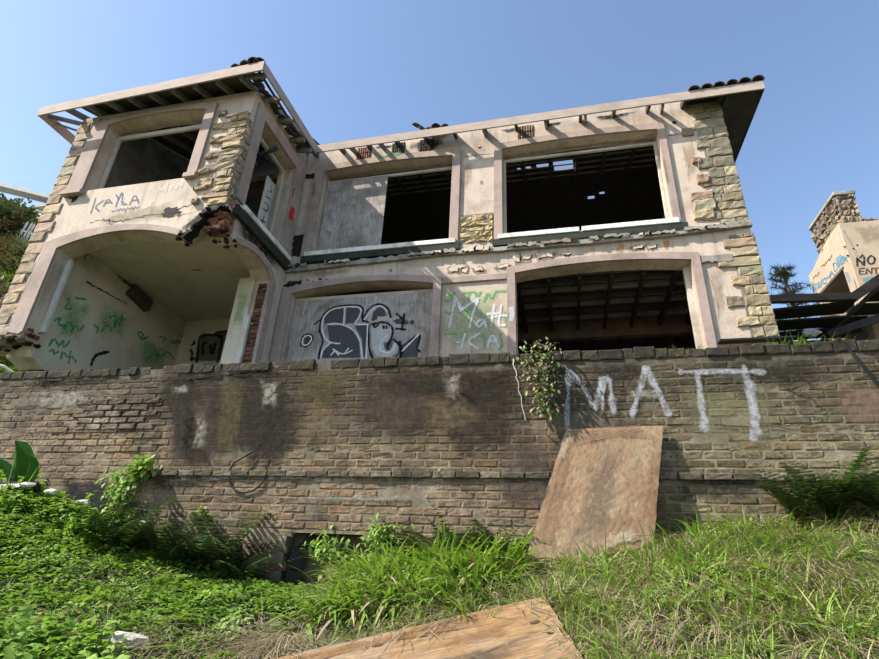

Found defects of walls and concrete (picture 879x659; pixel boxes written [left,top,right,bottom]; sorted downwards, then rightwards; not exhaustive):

crack [90,204,198,225]
spalling [175,203,237,249]
spalling [407,212,494,256]
peeling [447,237,578,274]
peeling [589,223,728,252]